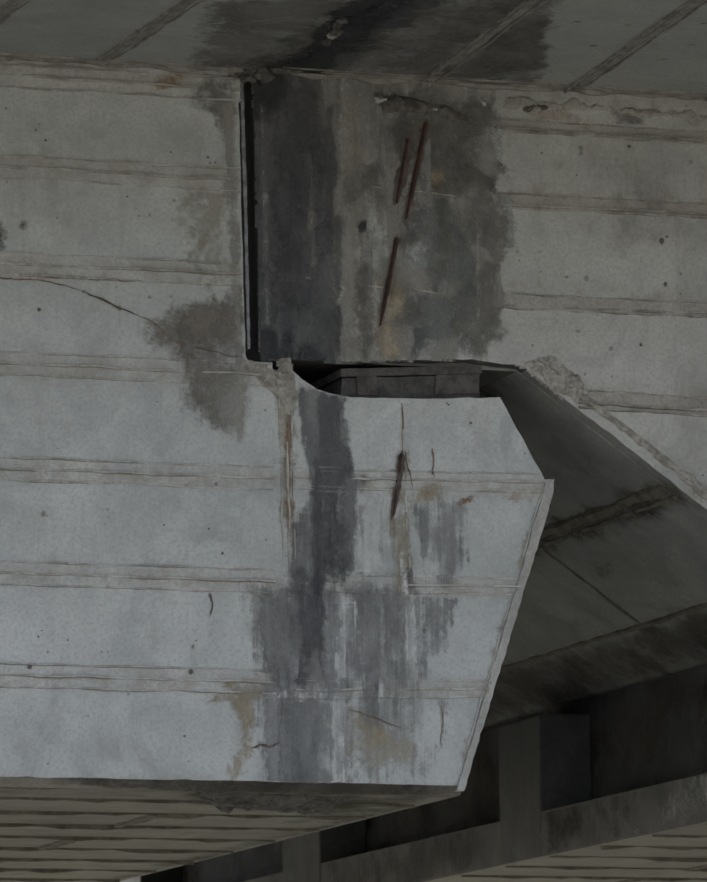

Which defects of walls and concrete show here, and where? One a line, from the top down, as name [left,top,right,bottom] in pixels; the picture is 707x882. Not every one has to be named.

damp [186,0,550,364]
crack [0,276,243,357]
damp [151,80,247,438]
spalling [515,355,707,500]
damp [519,485,682,565]
damp [72,388,469,811]
damp [486,613,707,718]
damp [462,735,500,823]